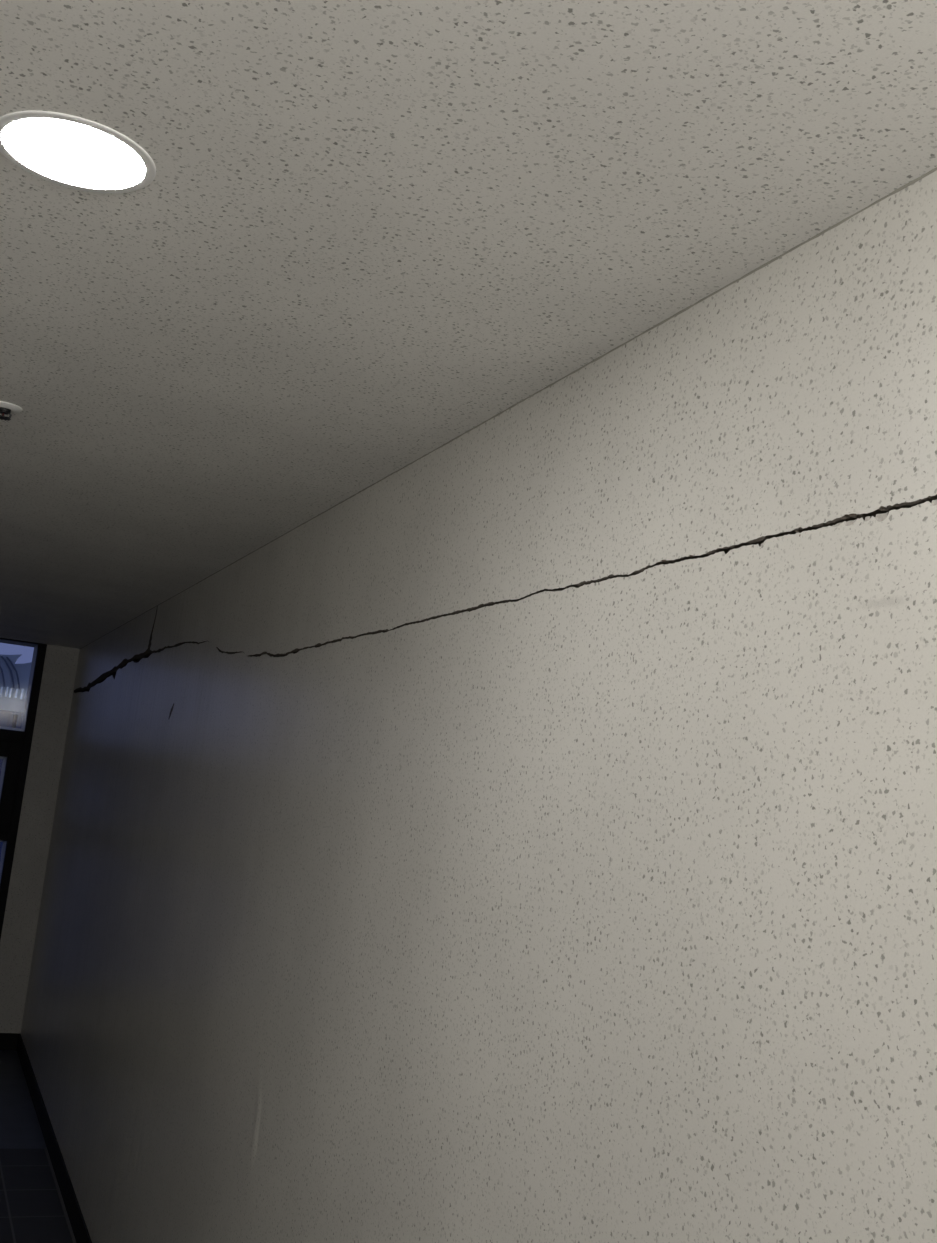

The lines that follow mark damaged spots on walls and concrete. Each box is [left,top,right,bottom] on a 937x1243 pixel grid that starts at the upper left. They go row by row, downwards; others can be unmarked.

crack [74,494,937,692]